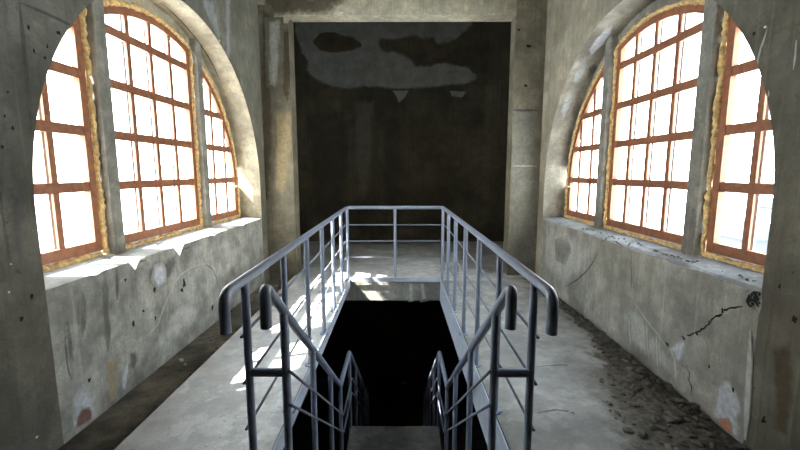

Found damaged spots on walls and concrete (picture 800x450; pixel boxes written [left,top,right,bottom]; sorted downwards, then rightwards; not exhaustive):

peeling [293,22,481,103]
crack [600,237,743,396]
spalling [741,288,762,315]
spalling [712,376,743,442]